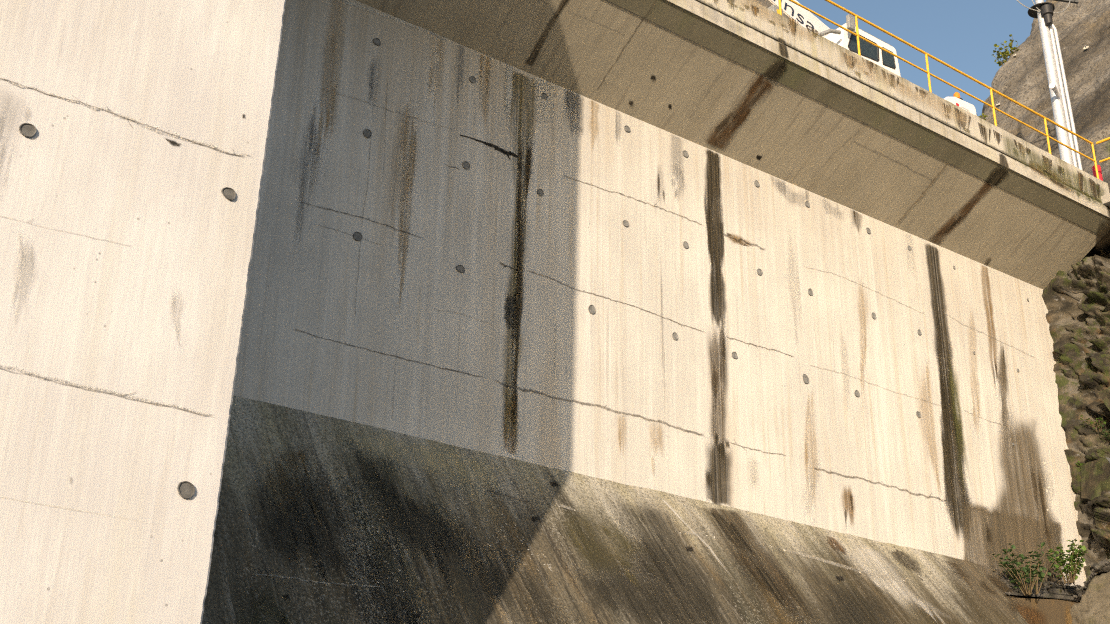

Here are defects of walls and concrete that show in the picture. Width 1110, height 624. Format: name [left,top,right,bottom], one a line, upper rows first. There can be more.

damp [843,53,903,87]
damp [942,104,1064,186]
damp [1071,82,1110,137]
damp [505,0,568,435]
damp [1096,206,1110,245]
damp [705,150,809,612]
damp [907,234,1064,621]